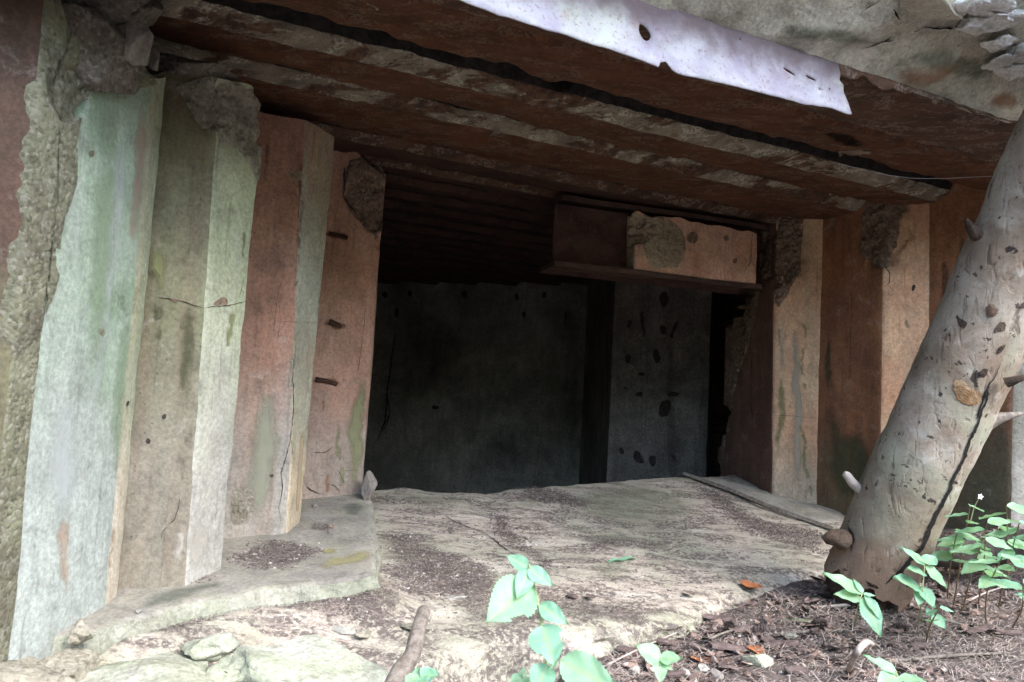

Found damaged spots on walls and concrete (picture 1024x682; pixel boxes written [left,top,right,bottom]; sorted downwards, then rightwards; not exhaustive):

spalling [0,0,262,354]
spalling [345,157,385,239]
spalling [630,215,698,269]
spalling [858,202,909,269]
crack [159,280,245,308]
crack [271,263,354,517]
rust [315,377,338,386]
spalling [718,217,804,468]